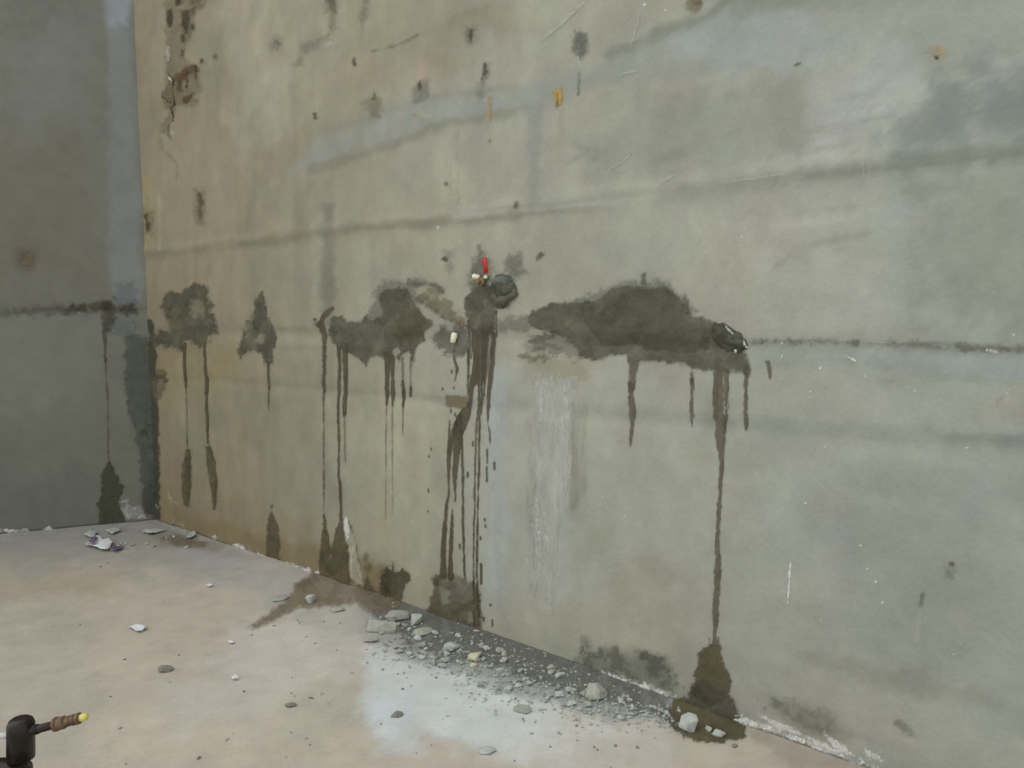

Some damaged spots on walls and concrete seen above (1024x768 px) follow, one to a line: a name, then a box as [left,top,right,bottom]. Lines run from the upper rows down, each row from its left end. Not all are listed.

leakage [96,283,218,525]
leakage [237,291,276,407]
leakage [252,246,883,768]